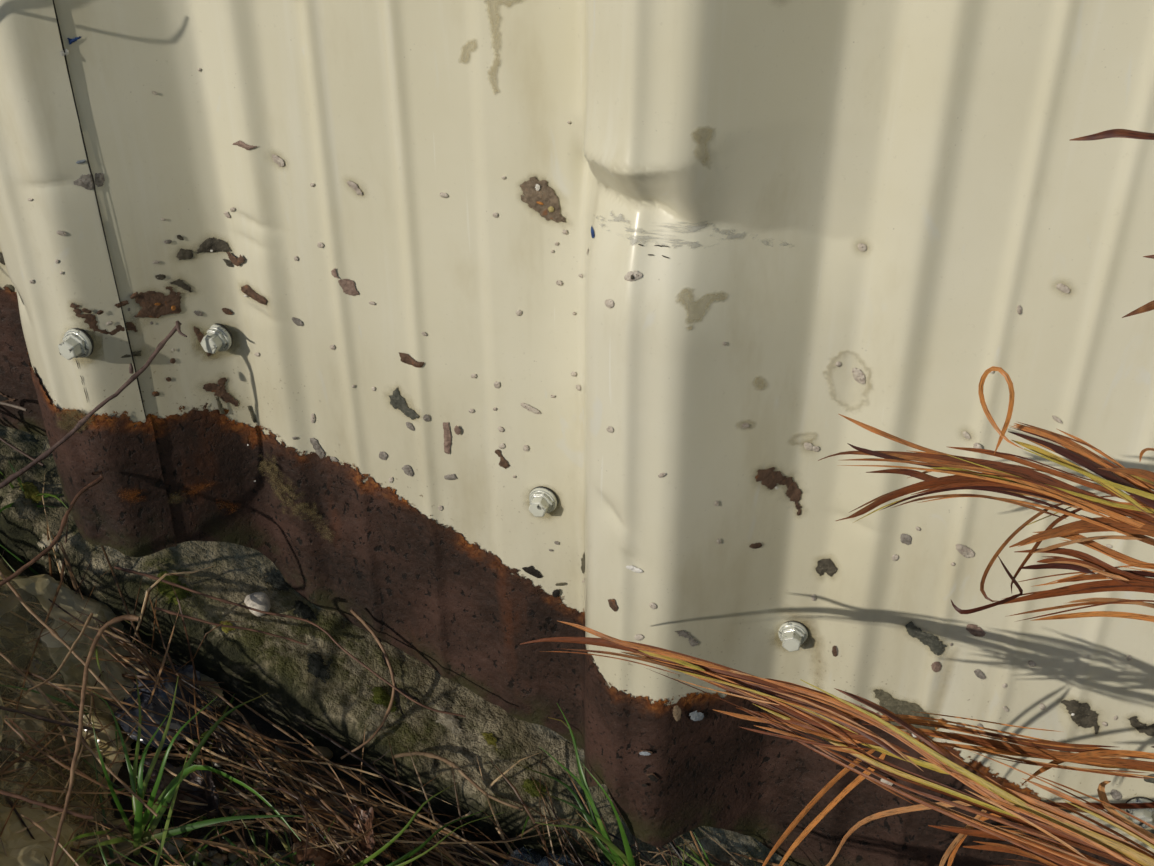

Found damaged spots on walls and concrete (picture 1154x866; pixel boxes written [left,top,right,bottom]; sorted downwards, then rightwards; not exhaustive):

corrosion [0,286,1143,866]
peeling [905,621,947,672]
peeling [966,624,986,637]
peeling [873,689,947,741]
peeling [1061,700,1099,734]